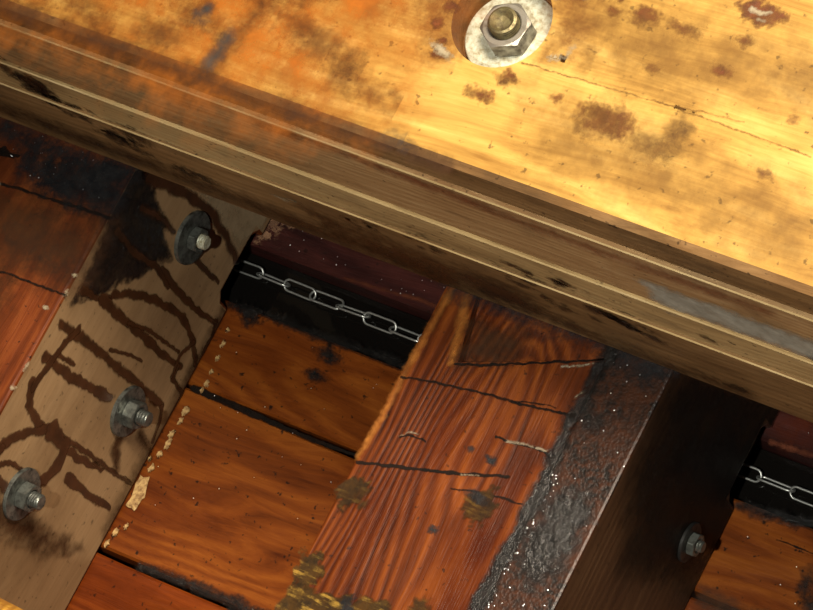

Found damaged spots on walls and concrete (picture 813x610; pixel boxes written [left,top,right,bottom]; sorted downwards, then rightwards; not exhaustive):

damp [737,0,788,27]
crack [0,146,20,158]
damp [0,106,160,171]
crack [0,183,111,219]
damp [173,167,541,363]
crack [0,271,67,297]
crack [454,359,601,367]
crack [400,376,576,418]
crack [495,435,548,455]
crack [356,461,523,505]